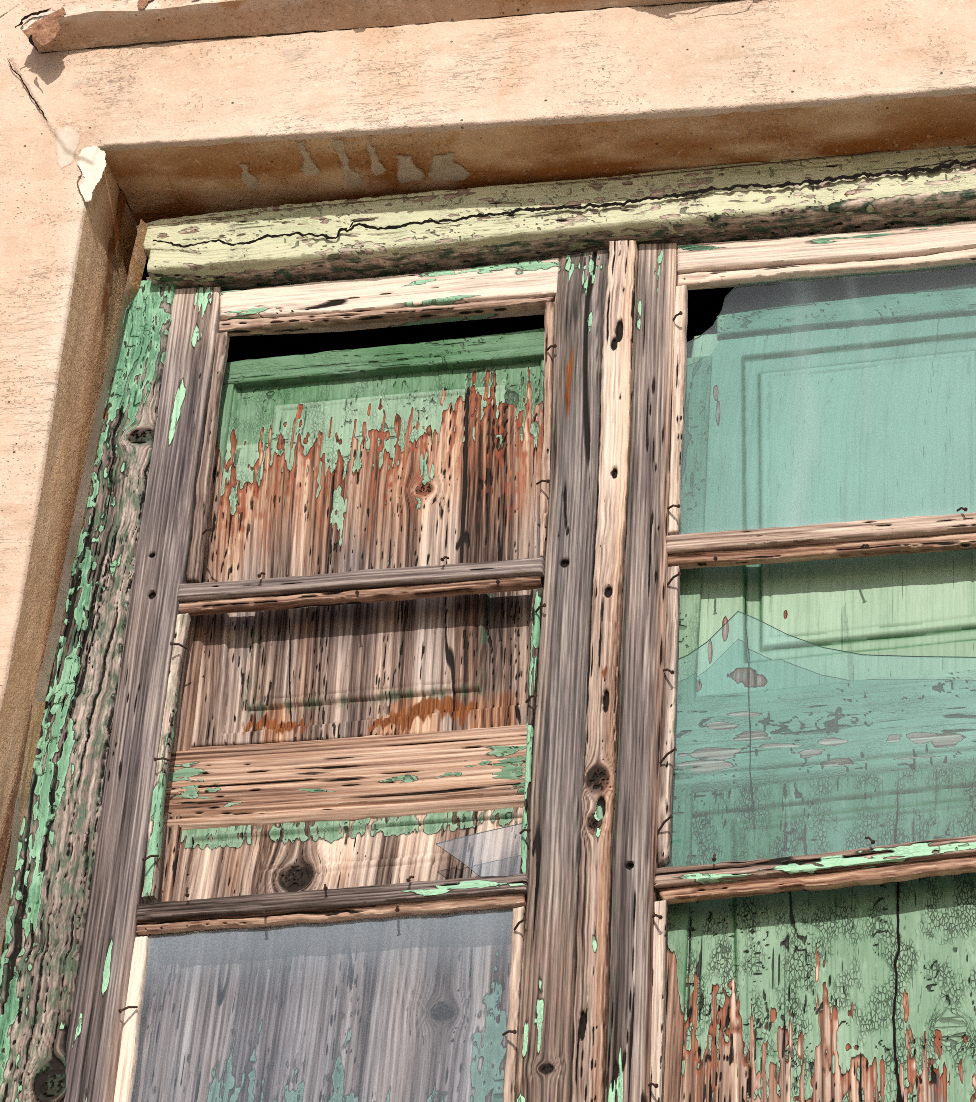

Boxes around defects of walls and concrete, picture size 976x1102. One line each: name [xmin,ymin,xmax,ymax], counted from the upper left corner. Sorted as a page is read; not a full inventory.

spalling [15,7,65,51]
crack [8,60,48,121]
peeling [55,126,106,202]
crack [148,148,976,248]